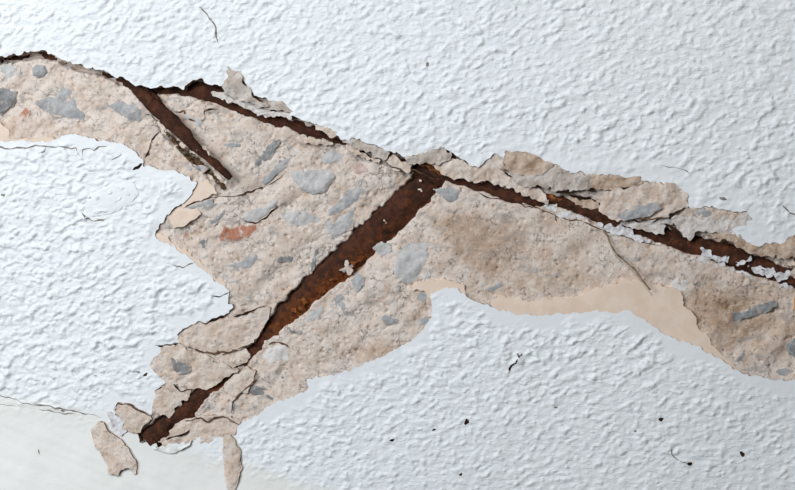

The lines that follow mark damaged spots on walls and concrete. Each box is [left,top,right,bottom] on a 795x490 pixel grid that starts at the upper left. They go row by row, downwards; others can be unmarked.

spalling [0,52,795,317]
rust [220,226,256,241]
spalling [137,181,795,446]
peeling [106,402,153,436]
peeling [91,421,138,476]
peeling [222,434,243,490]